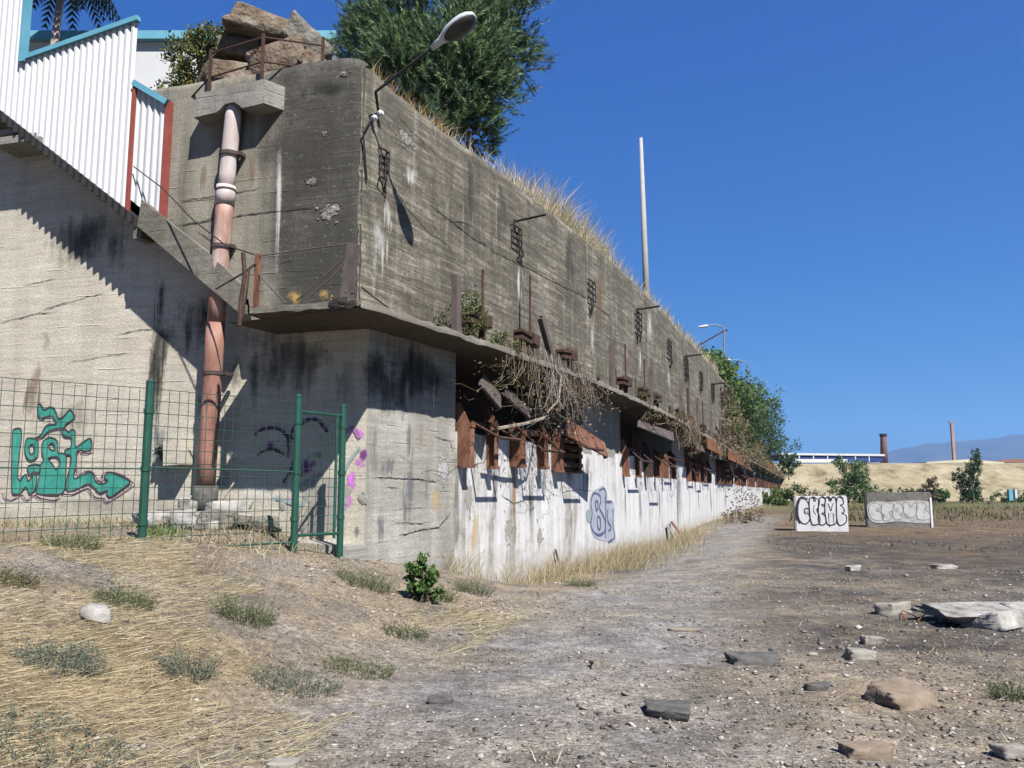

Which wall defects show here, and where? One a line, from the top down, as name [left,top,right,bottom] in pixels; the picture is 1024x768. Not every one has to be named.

spalling [315,204,342,224]
damp [150,287,167,407]
crack [376,456,451,535]